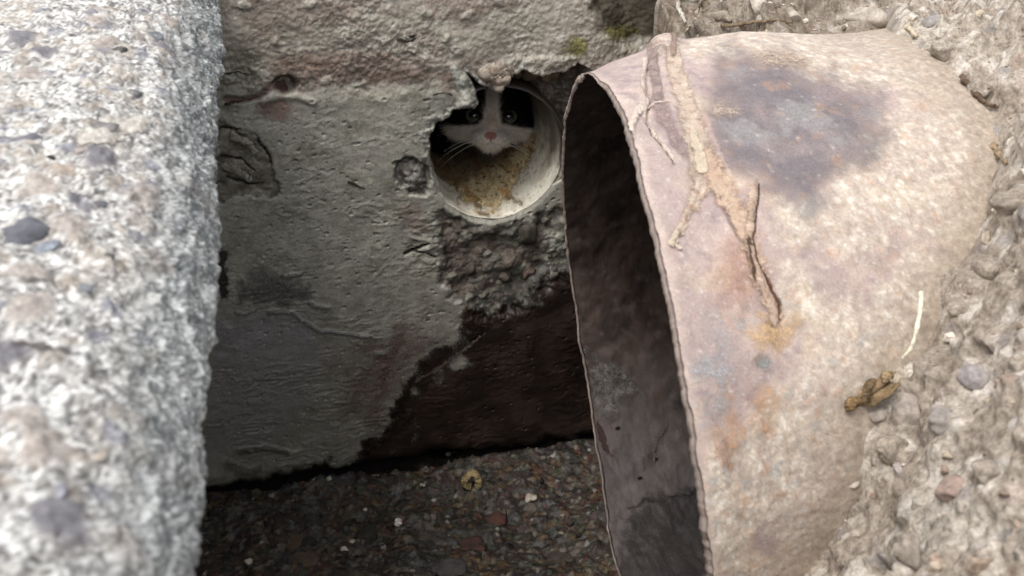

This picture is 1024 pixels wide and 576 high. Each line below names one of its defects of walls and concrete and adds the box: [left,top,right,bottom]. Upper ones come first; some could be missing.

peeling [215,119,280,203]
spalling [395,61,568,194]
crack [628,42,686,164]
spalling [439,208,568,307]
leakage [309,269,593,472]